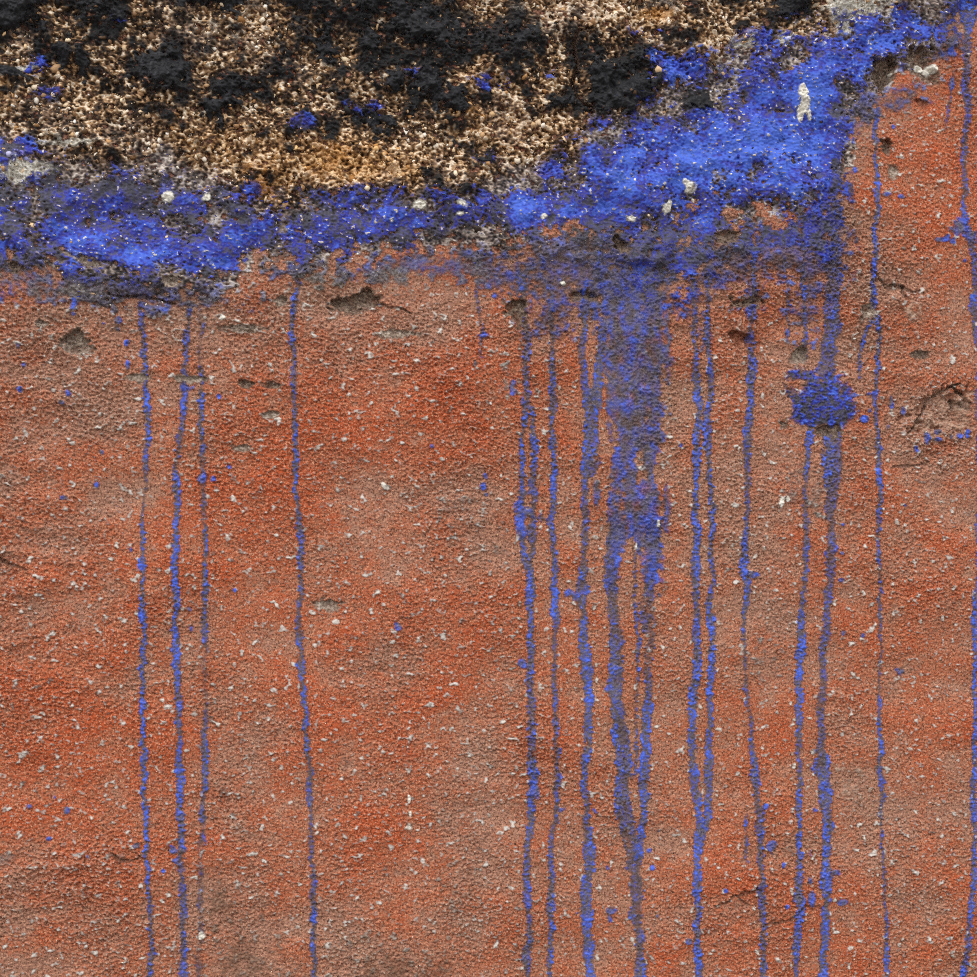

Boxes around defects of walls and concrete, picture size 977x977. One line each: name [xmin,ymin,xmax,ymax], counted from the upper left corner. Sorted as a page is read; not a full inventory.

crack [907,383,972,433]